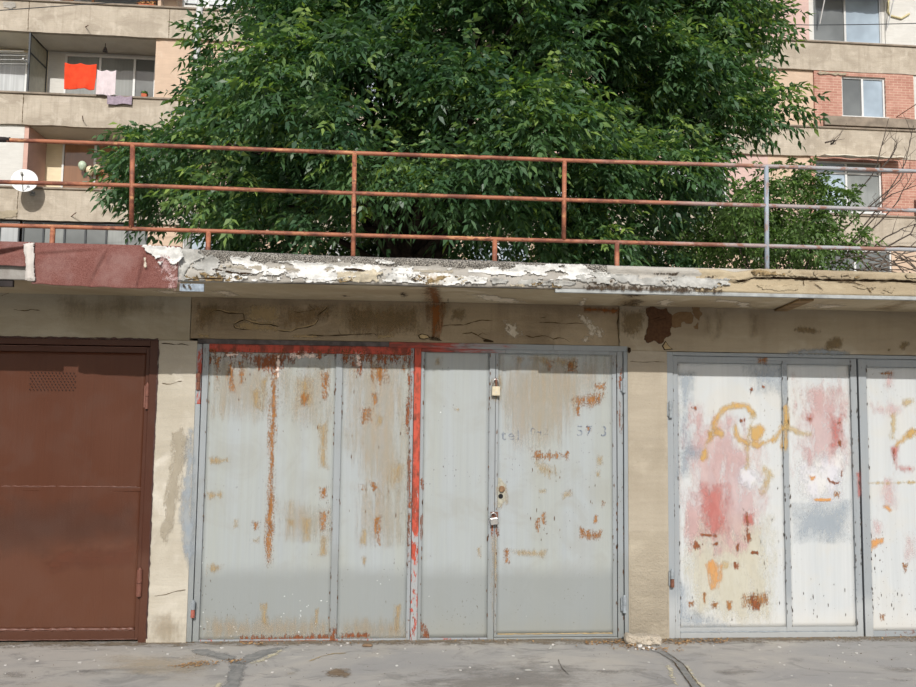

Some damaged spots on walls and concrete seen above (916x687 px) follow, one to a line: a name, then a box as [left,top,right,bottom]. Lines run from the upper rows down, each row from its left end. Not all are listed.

peeling [142,245,730,298]
crack [210,303,377,336]
corrosion [428,278,444,338]
crack [444,320,492,340]
flaking render [644,306,702,350]
corrosion [573,382,606,416]
corrosion [205,348,413,563]
corrosion [394,452,424,555]
corrosion [580,515,602,540]
corrosion [703,560,739,611]
corrosion [743,592,768,611]
corrosion [240,627,369,642]